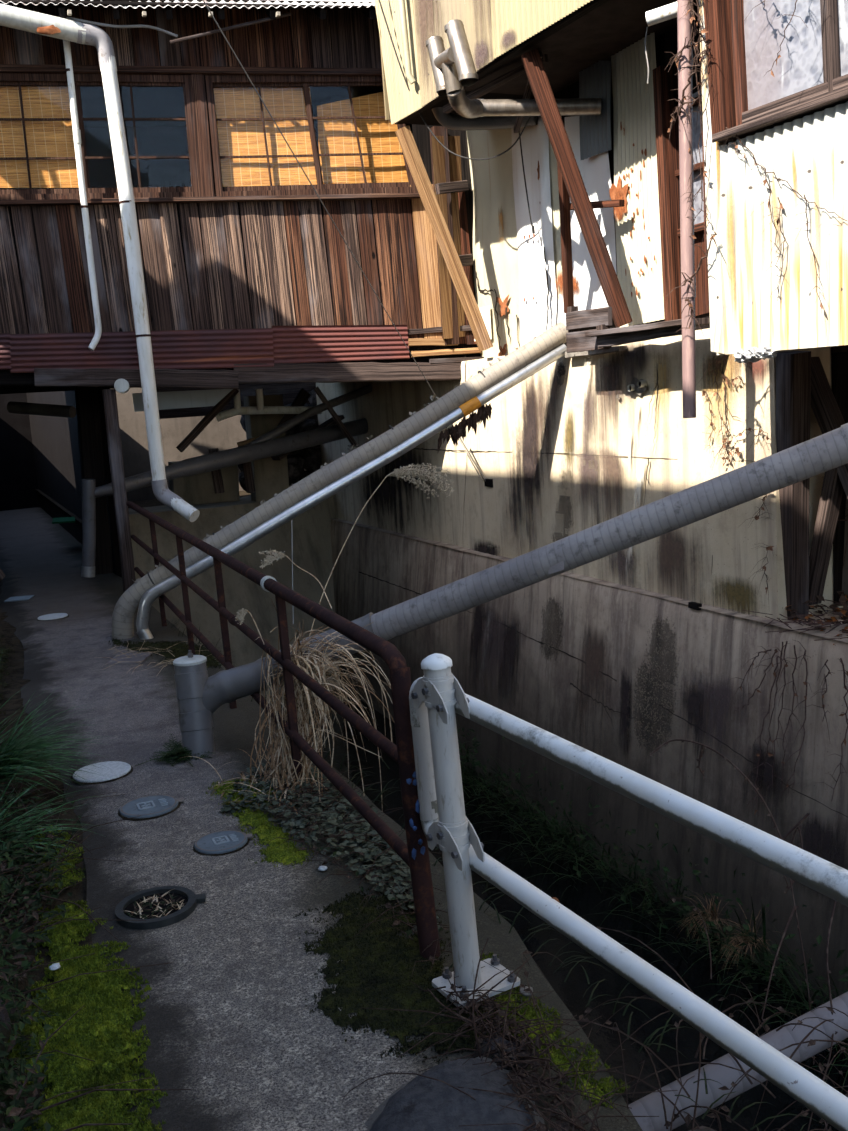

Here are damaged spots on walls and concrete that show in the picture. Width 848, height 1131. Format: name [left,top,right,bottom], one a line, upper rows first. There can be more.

water stain [415,0,439,73]
corrosion [609,176,629,221]
corrosion [716,142,746,304]
water stain [509,344,645,536]
water stain [609,547,634,583]
water stain [657,531,698,598]
water stain [712,579,756,615]
water stain [470,604,519,696]
water stain [575,628,604,741]
water stain [619,672,632,754]
water stain [683,673,746,752]